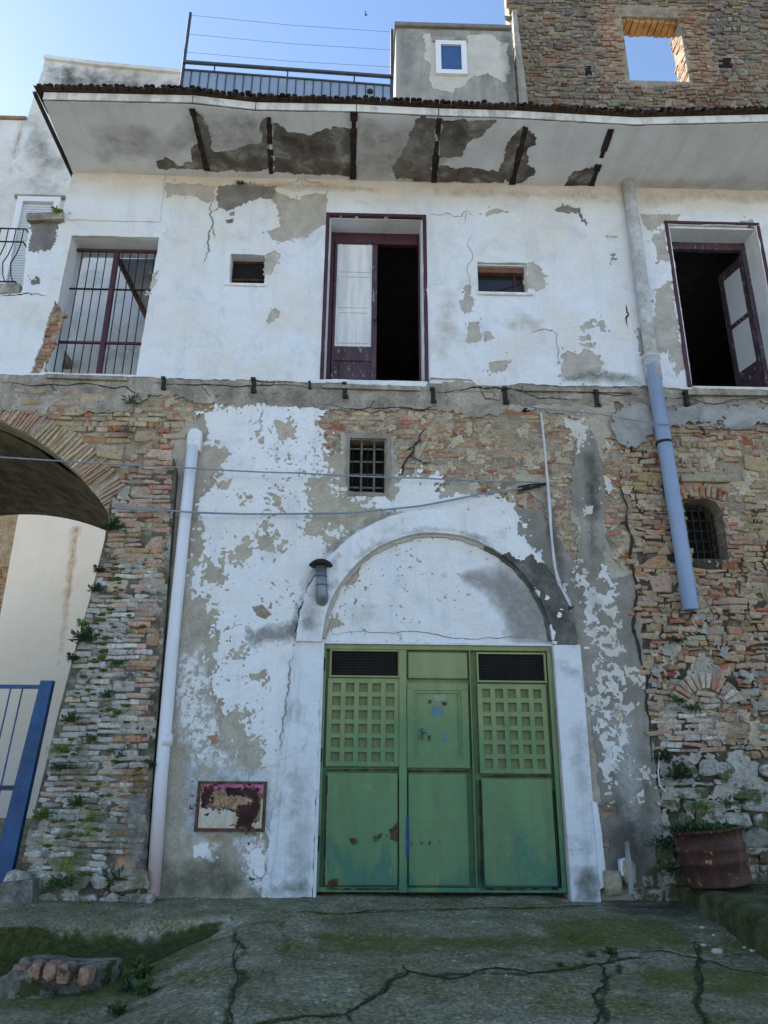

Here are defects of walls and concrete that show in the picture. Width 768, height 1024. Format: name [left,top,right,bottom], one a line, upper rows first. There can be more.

peeling [423,34,511,94]
peeling [156,111,351,275]
crack [203,196,221,263]
spalling [31,303,68,373]
peeling [651,281,685,377]
peeling [254,416,298,449]
crack [2,382,640,480]
peeling [195,449,391,591]
spalling [318,408,657,821]
leakage [468,571,544,640]
corrosion [189,781,263,845]
corrosion [374,825,399,841]